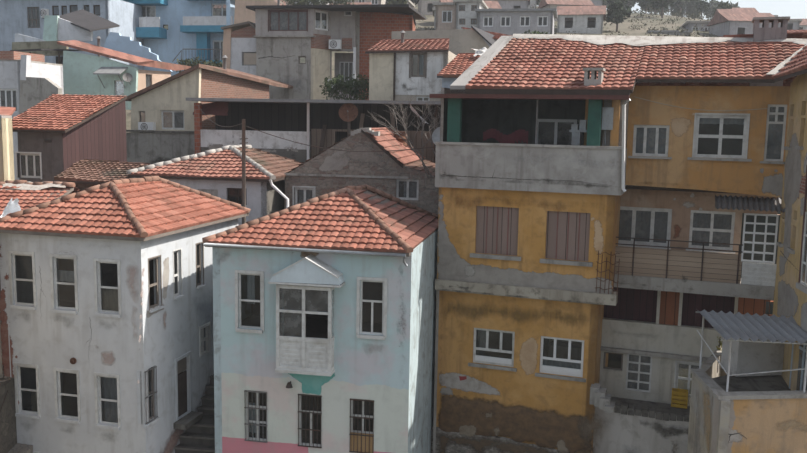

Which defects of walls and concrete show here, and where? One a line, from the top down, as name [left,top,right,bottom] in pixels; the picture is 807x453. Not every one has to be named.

flaking render [0,273,18,382]
flaking render [439,372,502,397]